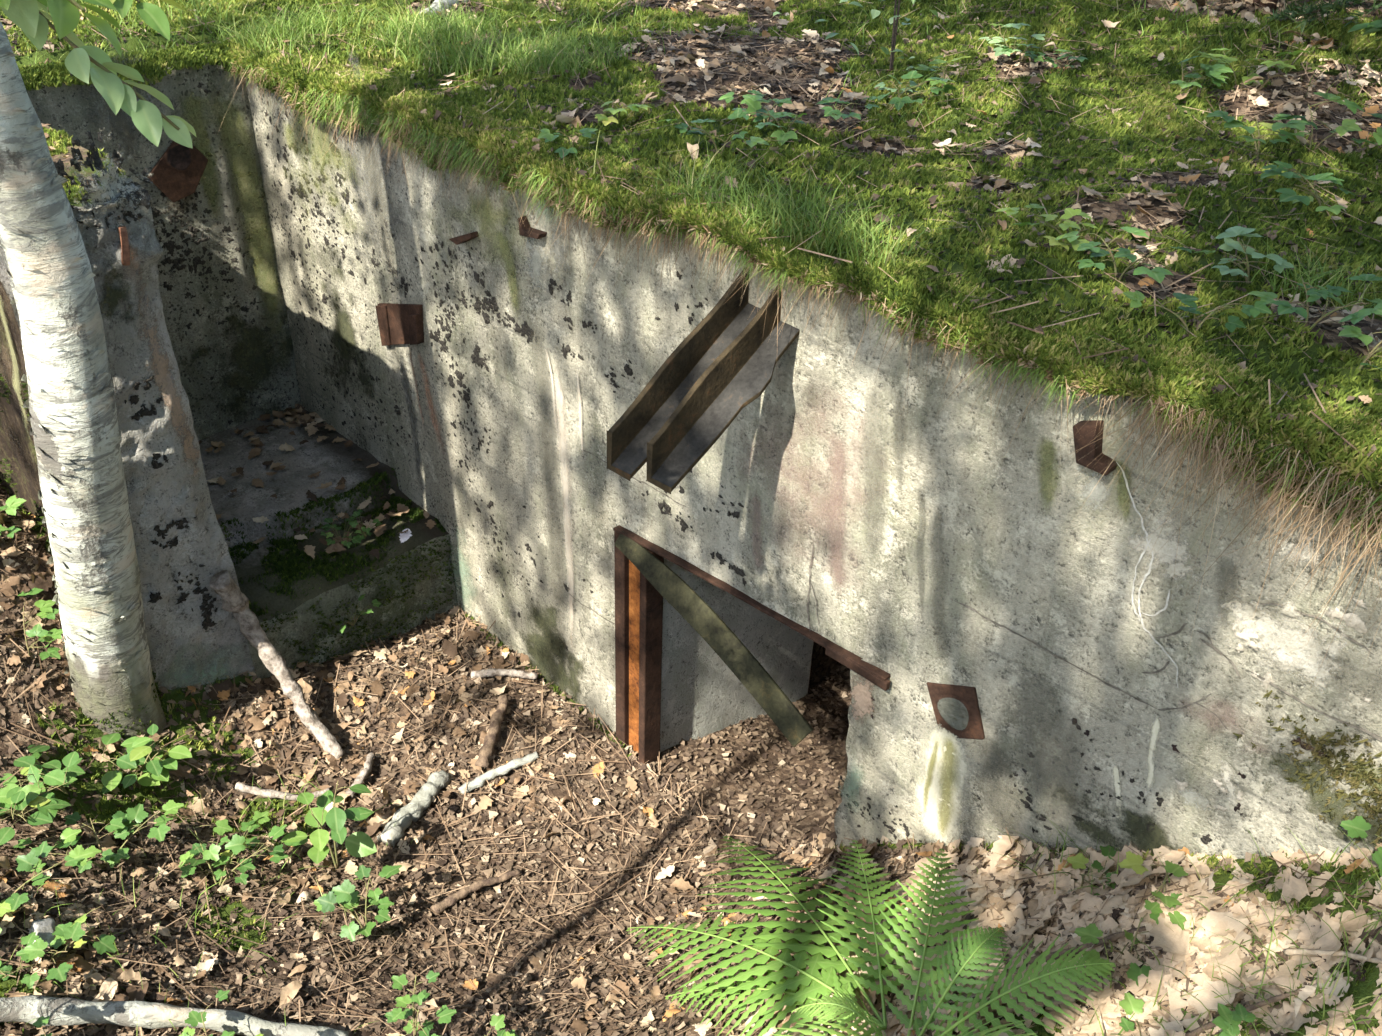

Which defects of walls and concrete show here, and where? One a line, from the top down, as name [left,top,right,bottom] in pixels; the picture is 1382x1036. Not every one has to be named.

water stain [184,97,218,212]
corrosion [118,226,135,266]
water stain [914,727,1011,846]